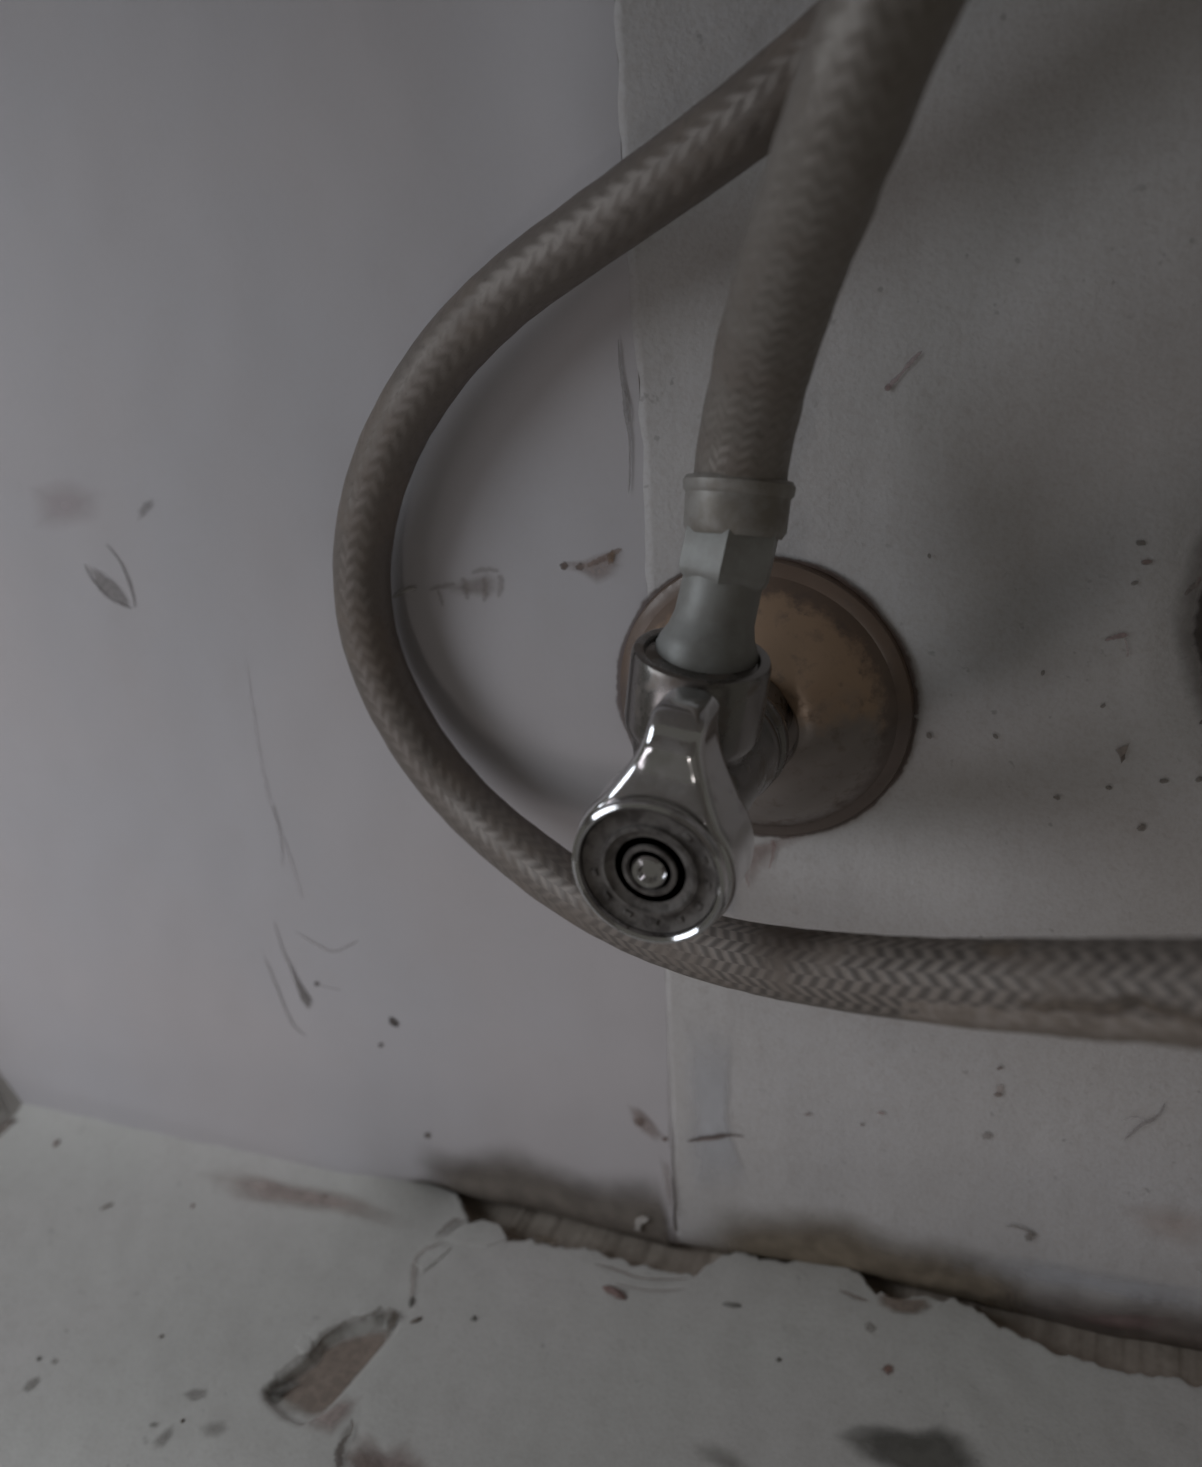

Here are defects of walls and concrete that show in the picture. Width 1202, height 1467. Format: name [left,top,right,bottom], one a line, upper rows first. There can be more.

corrosion [616,572,683,743]
corrosion [754,556,918,838]
spalling [412,1218,507,1272]
spalling [270,1304,414,1467]